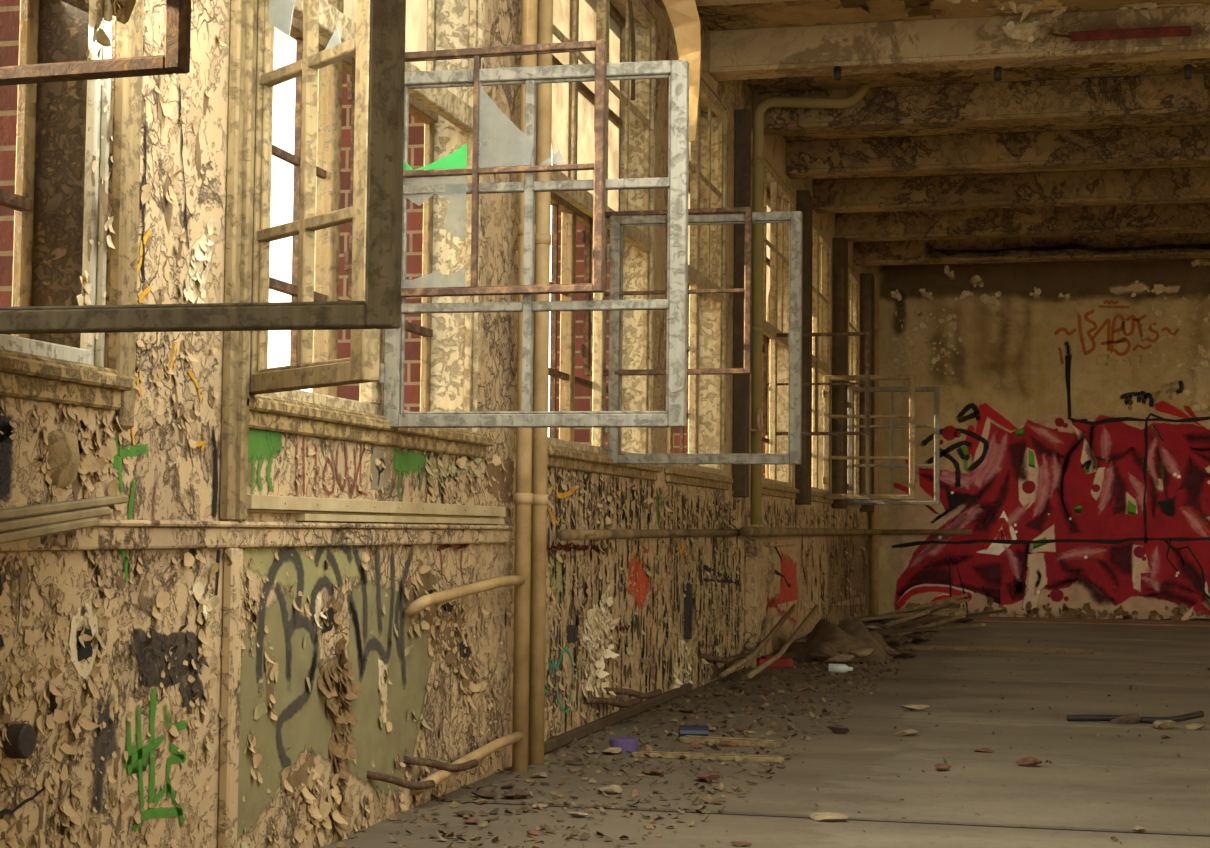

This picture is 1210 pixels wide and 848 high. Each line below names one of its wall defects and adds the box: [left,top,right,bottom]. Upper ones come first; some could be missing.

peeling [85,0,121,60]
peeling [77,80,115,306]
spalling [0,333,219,520]
peeling [278,434,394,497]
peeling [422,445,516,511]
peeling [0,539,514,848]